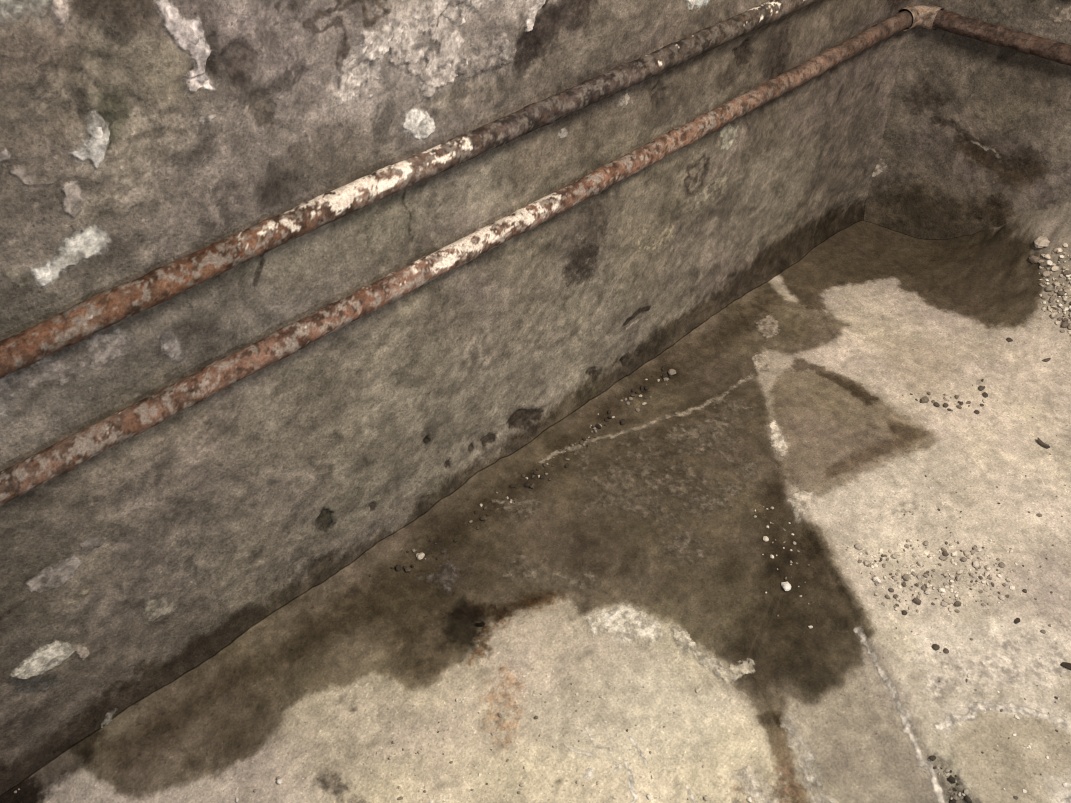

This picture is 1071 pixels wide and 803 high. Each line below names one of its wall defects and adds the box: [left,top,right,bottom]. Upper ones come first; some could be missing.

peeling [157,0,255,92]
peeling [526,0,546,32]
peeling [0,149,85,218]
peeling [71,111,116,168]
peeling [6,226,109,287]
leakage [563,192,611,287]
leakage [778,220,1042,350]
peeling [0,328,135,416]
leakage [410,360,836,684]
leakage [920,633,1071,696]
crack [854,626,1071,803]
leakage [782,717,835,803]